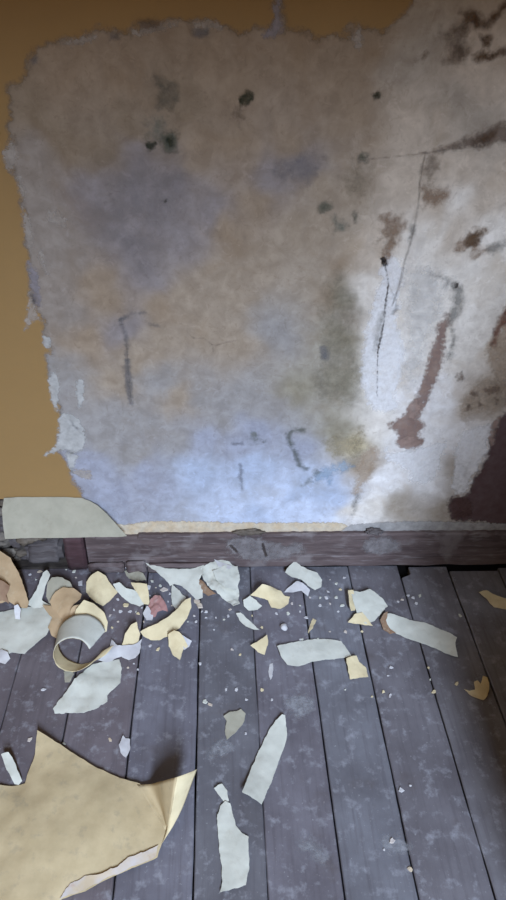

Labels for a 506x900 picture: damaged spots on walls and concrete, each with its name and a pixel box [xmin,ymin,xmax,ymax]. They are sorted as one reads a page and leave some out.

leakage [146,134,176,150]
leakage [239,91,254,105]
peeling [2,0,506,536]
crack [377,258,389,388]
corrosion [389,283,462,449]